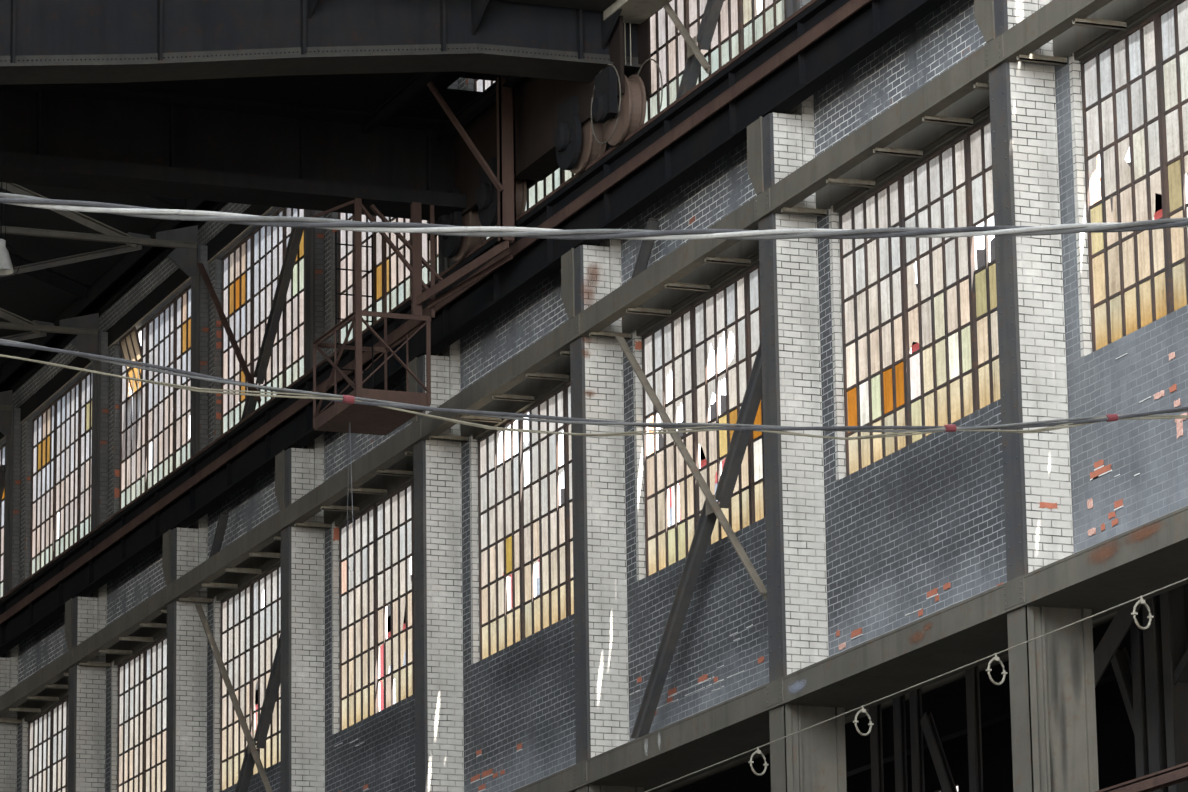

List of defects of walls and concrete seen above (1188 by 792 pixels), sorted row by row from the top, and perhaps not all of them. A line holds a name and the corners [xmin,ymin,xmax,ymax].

peeling [1153,384,1188,439]
peeling [1090,459,1112,481]
peeling [1088,498,1123,536]